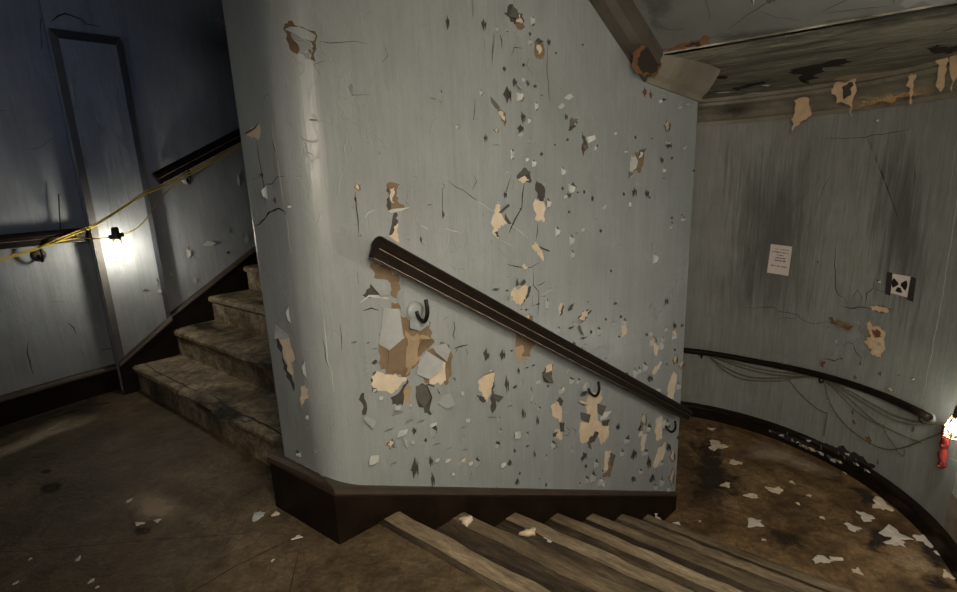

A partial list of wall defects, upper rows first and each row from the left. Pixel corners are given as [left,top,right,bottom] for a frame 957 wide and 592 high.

peeling [481,4,562,60]
peeling [789,26,957,117]
peeling [554,94,599,155]
peeling [791,97,812,131]
crack [252,95,292,255]
peeling [386,182,410,248]
peeling [479,63,585,261]
peeling [561,167,606,215]
crack [758,252,883,324]
peeling [274,307,309,407]
peeling [359,262,685,492]
peeling [827,305,889,357]